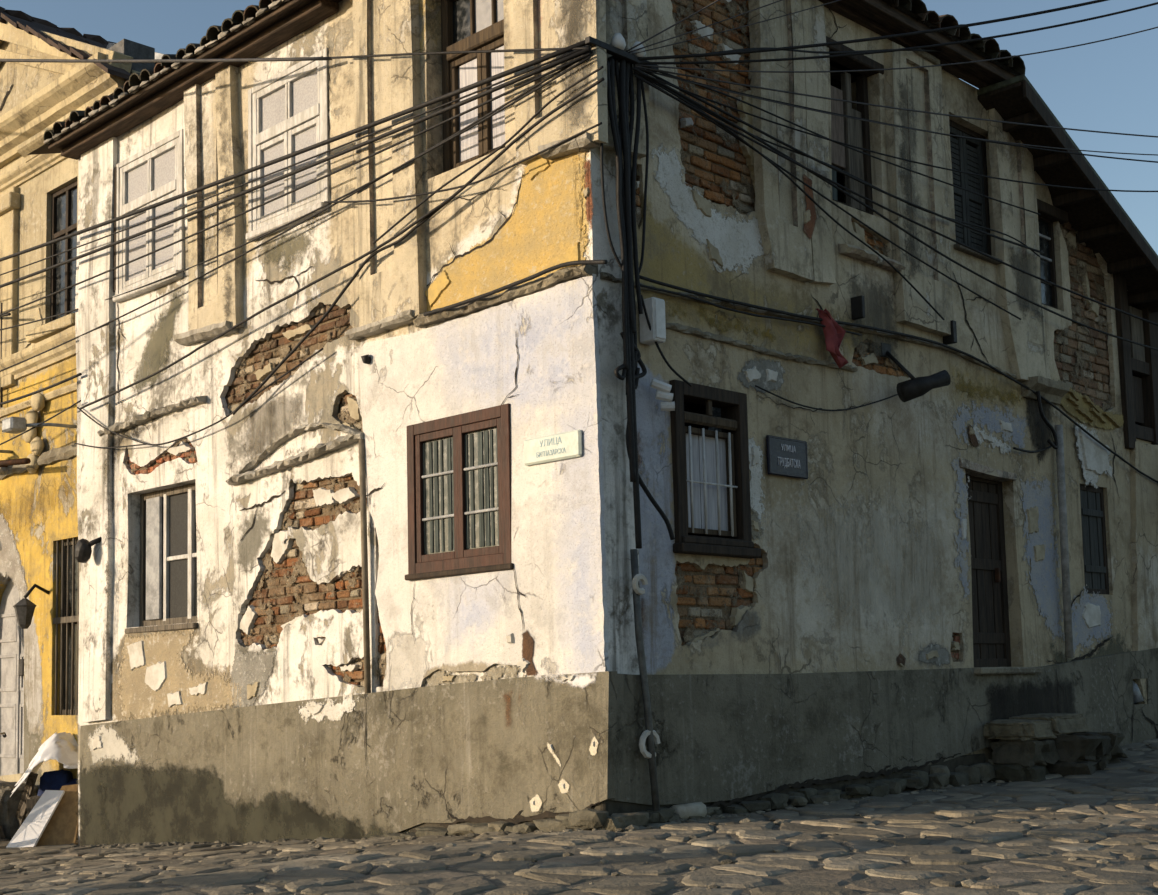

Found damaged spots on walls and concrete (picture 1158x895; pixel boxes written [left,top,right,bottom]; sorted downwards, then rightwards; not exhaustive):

spalling [651,0,764,275]
peeling [425,150,593,312]
spalling [225,305,353,413]
crack [501,331,520,405]
spalling [1054,222,1124,488]
spalling [127,438,197,474]
spalling [0,514,28,594]
spalling [88,475,367,766]
peeling [297,606,387,728]
crack [513,569,525,624]
spalling [675,432,767,645]
leakage [76,761,392,846]